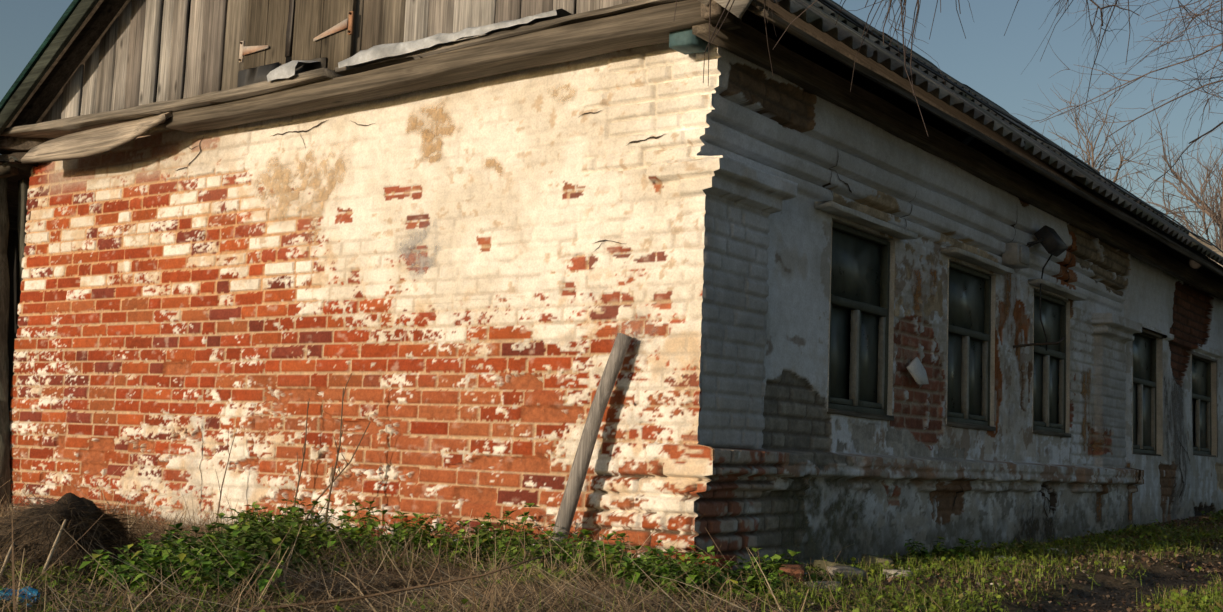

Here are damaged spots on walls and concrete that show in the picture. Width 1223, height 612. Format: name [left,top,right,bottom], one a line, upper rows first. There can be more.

flaking render [719,61,817,133]
peeling [9,162,713,562]
peeling [752,186,987,568]
flaking render [1168,280,1214,390]